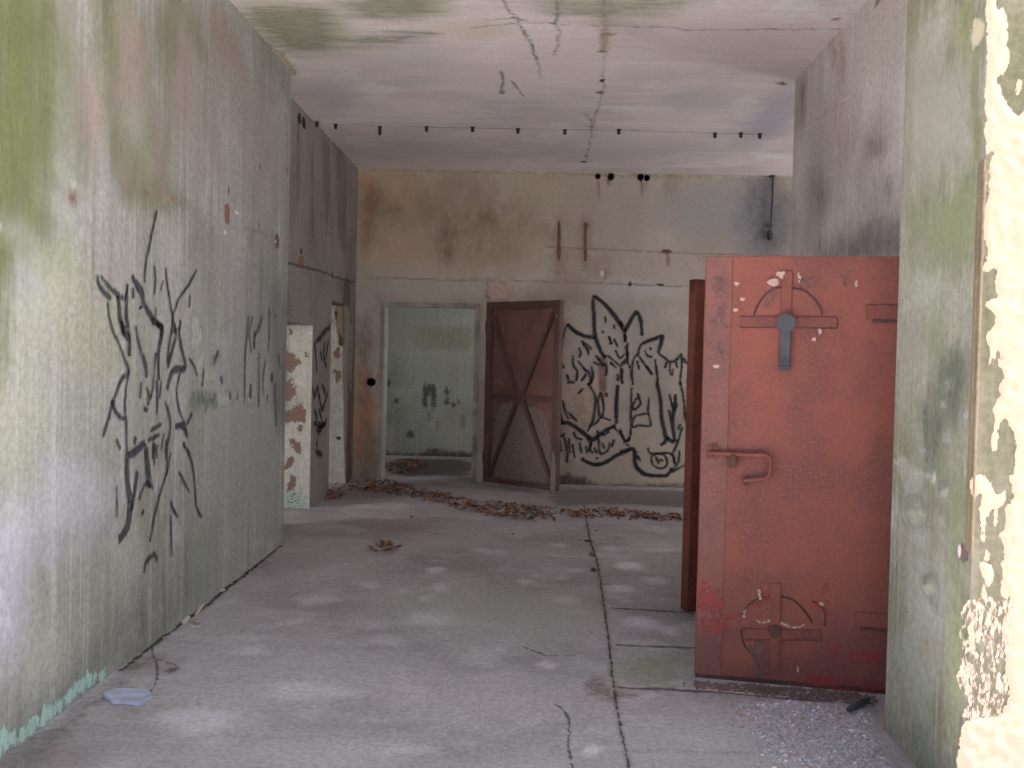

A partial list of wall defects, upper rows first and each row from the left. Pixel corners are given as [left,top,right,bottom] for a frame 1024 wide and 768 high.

peeling [284,351,309,506]
peeling [956,0,1024,768]
crack [555,704,574,768]